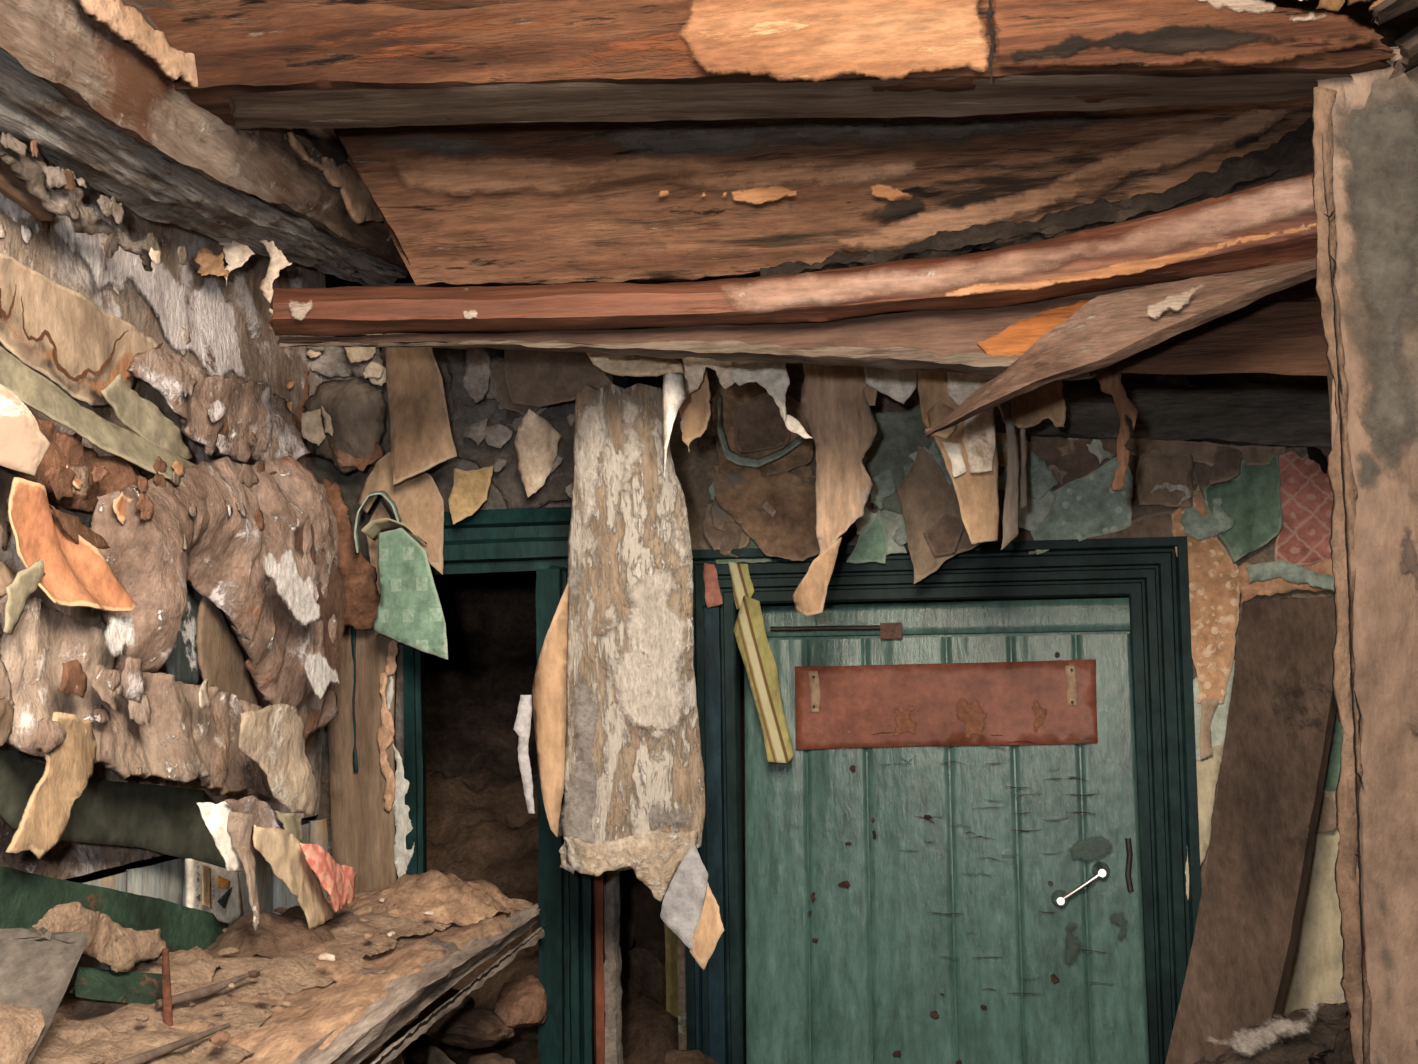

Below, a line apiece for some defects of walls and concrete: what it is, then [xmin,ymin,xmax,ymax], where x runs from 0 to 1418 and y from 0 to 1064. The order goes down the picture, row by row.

peeling [0,132,386,487]
peeling [586,353,735,395]
damp [1333,77,1418,486]
peeling [5,417,185,525]
peeling [444,348,607,557]
peeling [994,407,1133,532]
peeling [0,594,274,799]
flaking render [265,550,320,625]
flaking render [303,651,339,699]
peeling [322,477,380,630]
peeling [594,517,688,738]
damp [1401,530,1418,589]